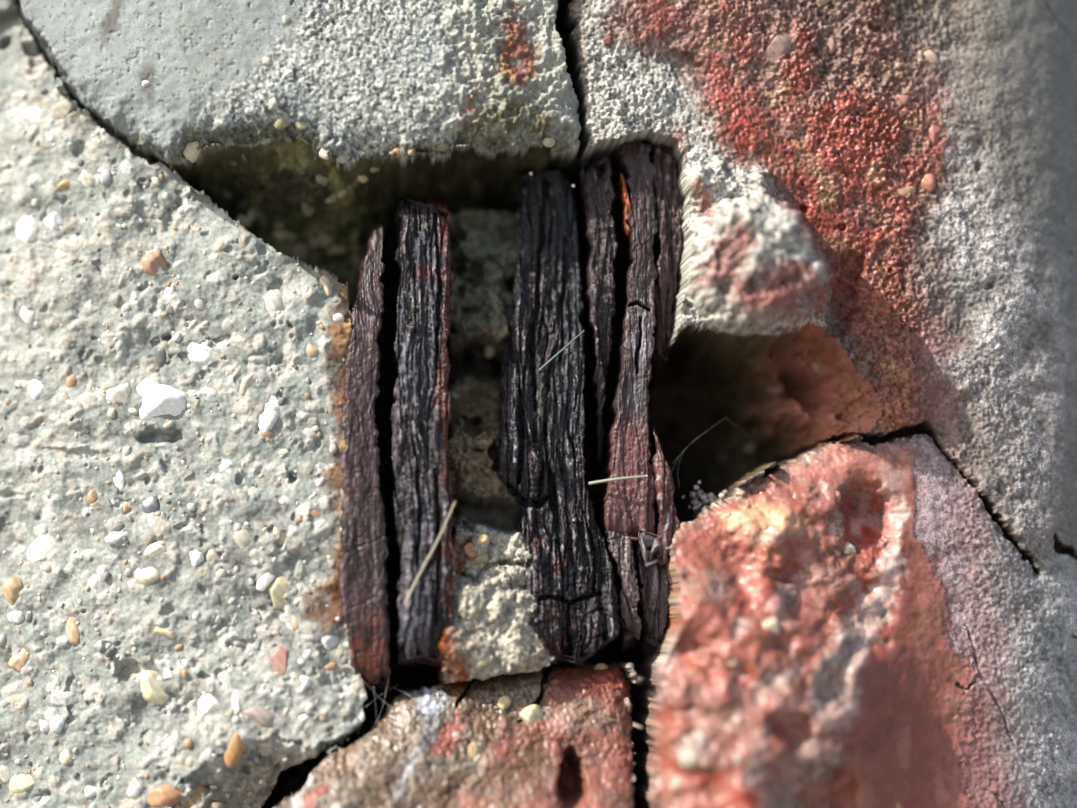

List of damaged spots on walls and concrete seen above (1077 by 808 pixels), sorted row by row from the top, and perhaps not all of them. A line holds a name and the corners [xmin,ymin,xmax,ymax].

crack [15,0,159,166]
crack [555,0,591,163]
corrosion [303,197,468,700]
corrosion [493,140,704,667]
peeling [609,0,1020,808]
crack [763,420,1077,575]
crack [262,699,387,808]
peeling [427,704,463,756]
peeling [458,663,633,808]
crack [614,648,663,808]